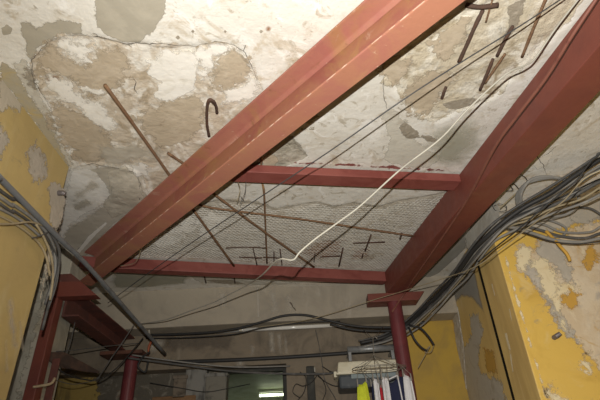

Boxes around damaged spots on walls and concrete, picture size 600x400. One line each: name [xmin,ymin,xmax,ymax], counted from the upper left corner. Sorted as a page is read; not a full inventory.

flaking render [13,20,263,238]
spalling [376,0,583,170]
peeling [453,306,507,400]
peeling [535,363,568,400]
flaking render [504,199,600,375]